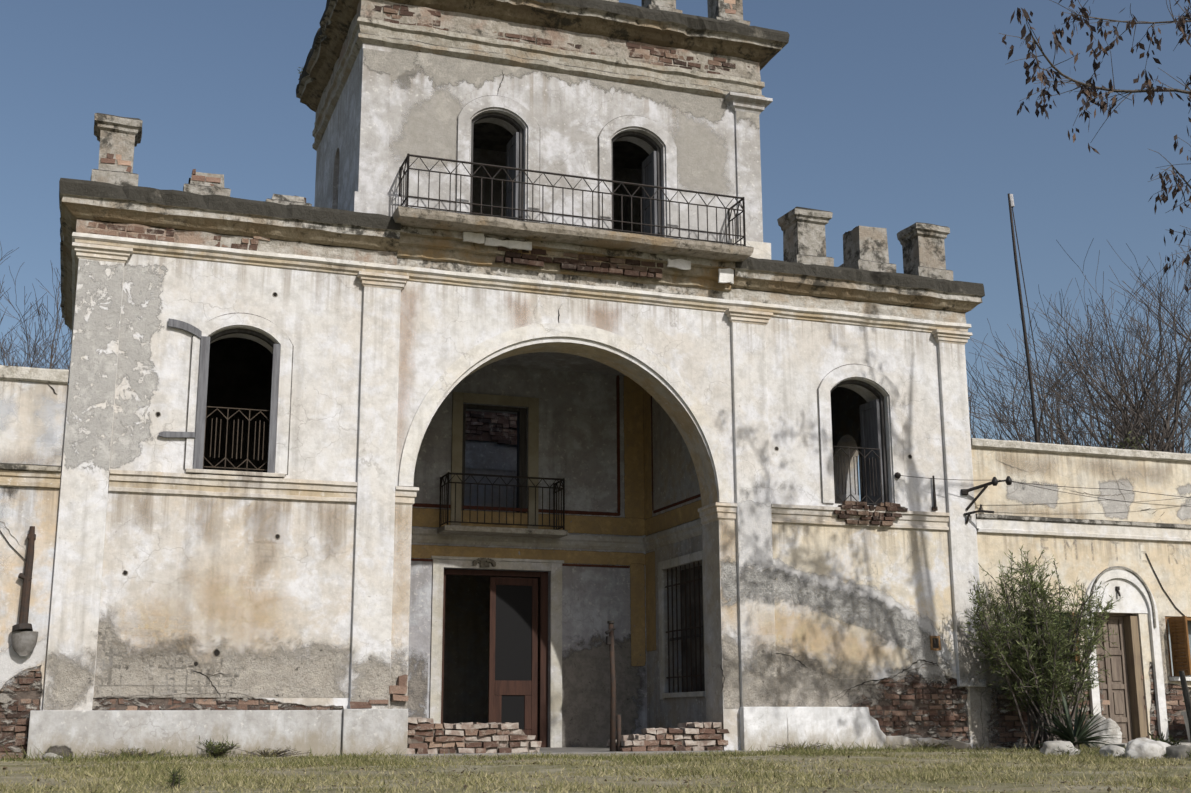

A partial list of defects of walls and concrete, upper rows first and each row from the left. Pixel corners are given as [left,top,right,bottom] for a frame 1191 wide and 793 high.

flaking render [372,4,449,31]
flaking render [494,31,596,55]
flaking render [626,42,750,74]
flaking render [463,232,691,279]
peeling [64,259,167,471]
peeling [1006,480,1059,508]
peeling [1098,478,1135,519]
spalling [720,500,1041,748]
spalling [0,614,428,760]
spalling [562,635,645,747]
flaking render [1068,663,1110,730]